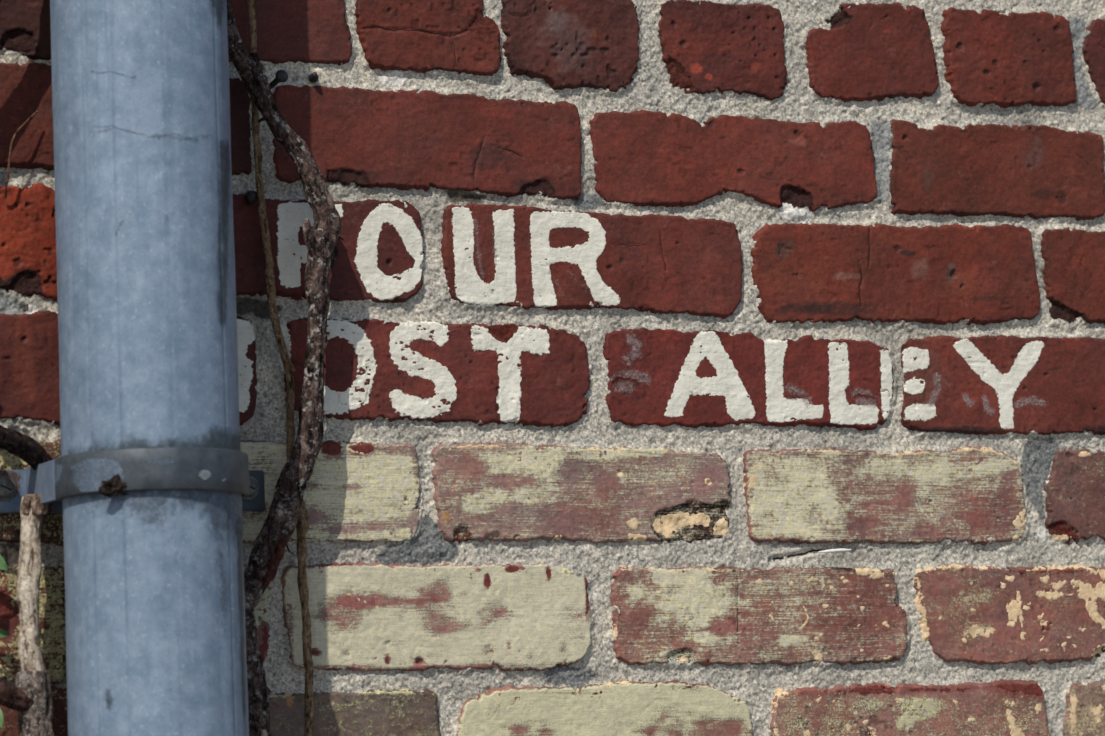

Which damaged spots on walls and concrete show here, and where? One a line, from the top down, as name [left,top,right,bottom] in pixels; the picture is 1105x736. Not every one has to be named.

peeling [436,444,731,543]
peeling [616,567,908,665]
peeling [913,564,1105,663]
peeling [270,689,438,736]
peeling [457,681,752,736]
peeling [769,683,1049,736]
peeling [1064,684,1105,736]